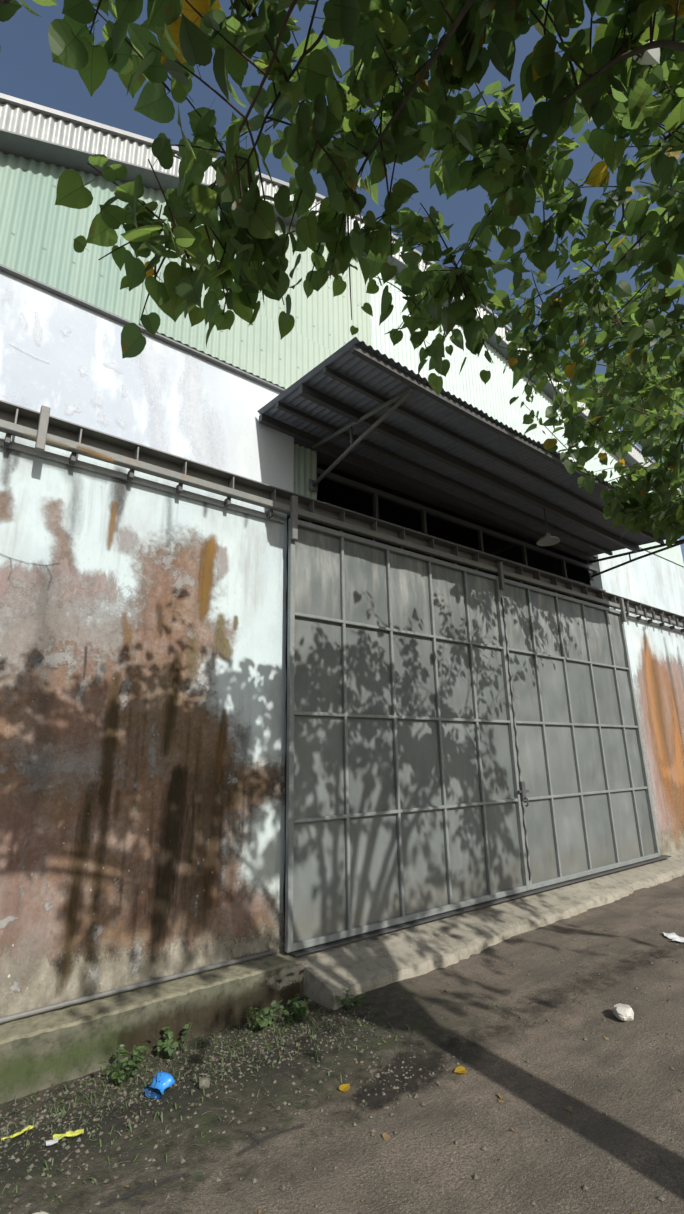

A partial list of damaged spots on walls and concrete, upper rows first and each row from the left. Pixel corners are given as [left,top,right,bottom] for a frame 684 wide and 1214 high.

rust [33,436,127,548]
rust [200,536,238,660]
water stain [164,653,180,755]
rust [216,710,226,787]
rust [643,637,684,830]
water stain [60,673,119,987]
water stain [151,766,186,960]